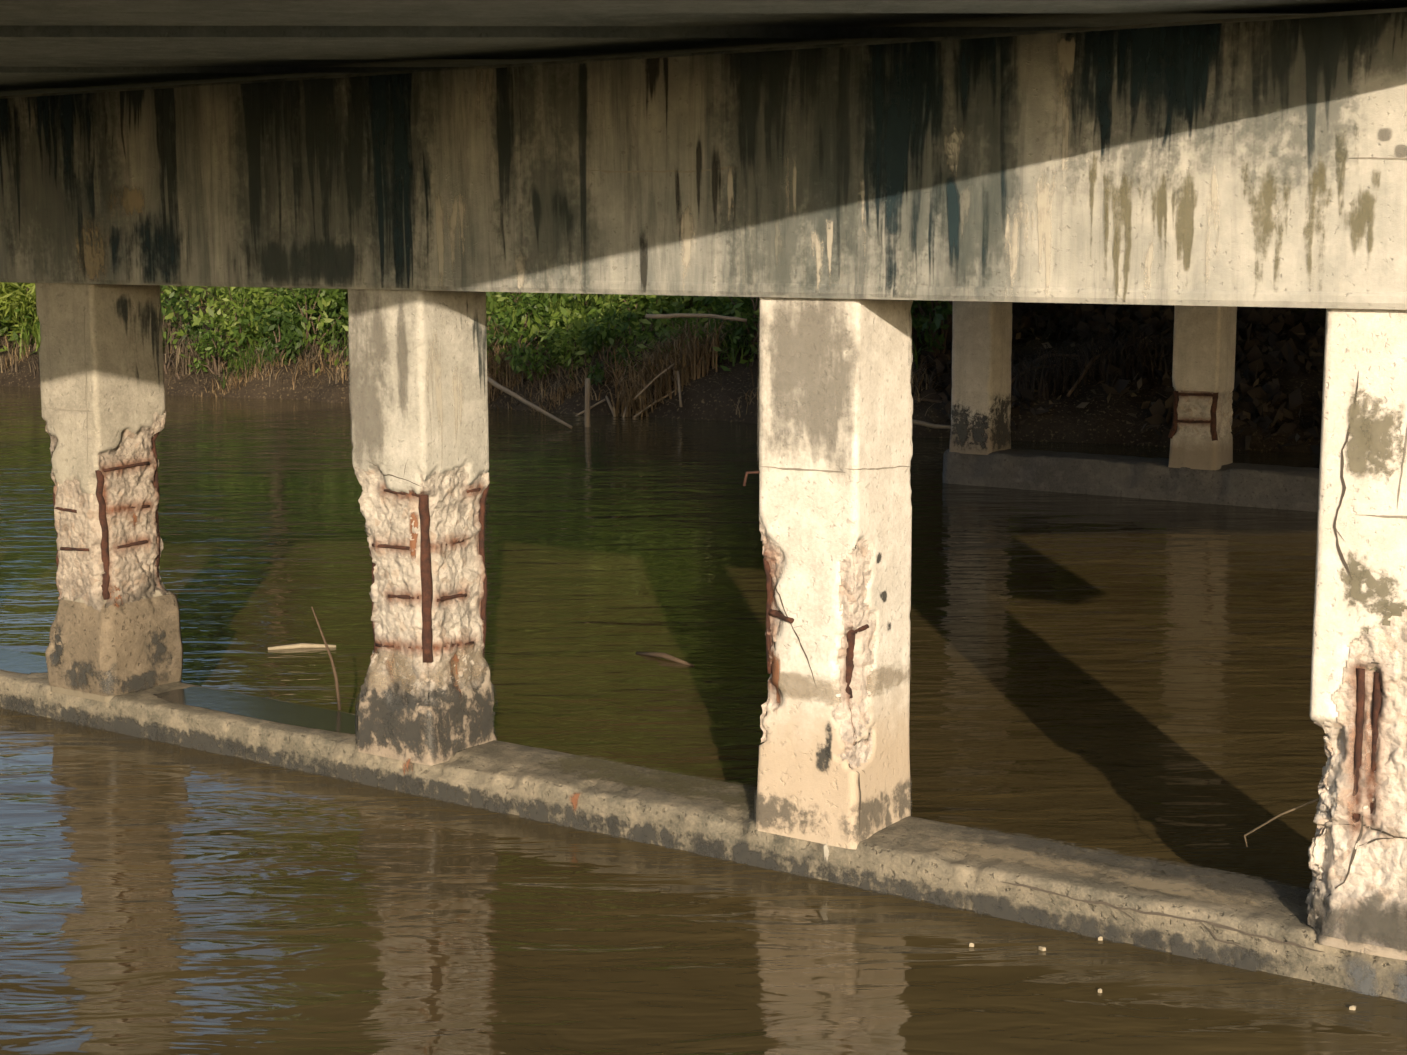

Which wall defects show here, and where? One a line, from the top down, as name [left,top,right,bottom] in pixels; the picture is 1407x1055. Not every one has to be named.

water stain [0,88,189,283]
water stain [241,73,466,288]
water stain [640,233,648,290]
water stain [757,12,1407,458]
crack [1347,154,1407,162]
spalling [43,411,173,612]
rust [410,512,418,558]
spalling [355,464,489,708]
rust [769,650,780,703]
spalling [832,538,891,769]
spalling [1305,609,1407,951]
crack [1333,370,1407,579]